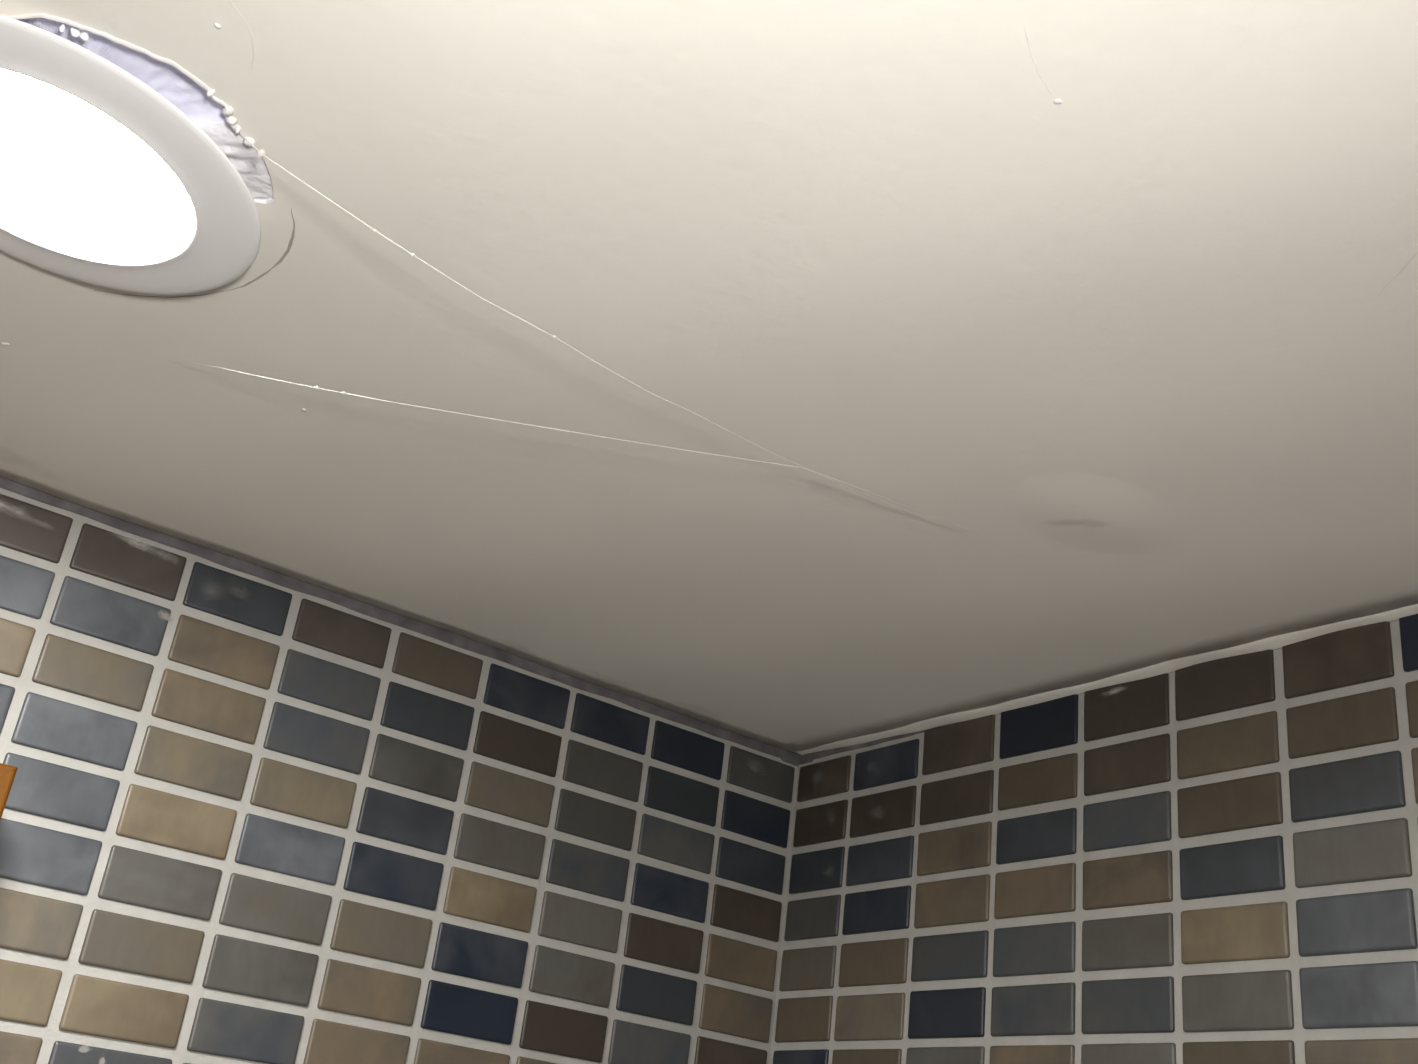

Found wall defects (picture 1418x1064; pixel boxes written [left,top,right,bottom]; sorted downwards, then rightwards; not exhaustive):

crack [94,209,295,298]